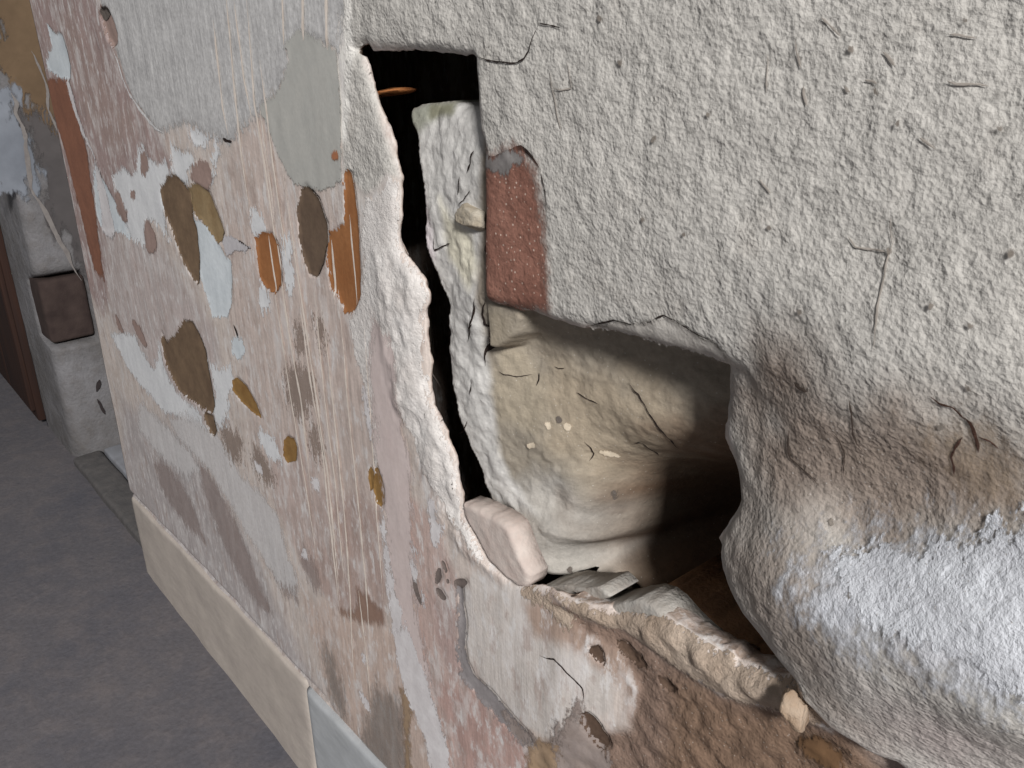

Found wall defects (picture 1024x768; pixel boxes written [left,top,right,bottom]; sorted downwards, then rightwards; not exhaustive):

peeling [46,24,71,81]
crack [478,23,560,64]
flaking render [98,0,345,285]
flaking render [248,169,361,314]
crack [590,315,718,348]
crack [848,219,895,348]
flaking render [161,311,330,489]
flaking render [368,467,385,507]
spalling [411,100,829,730]
crack [931,397,998,474]
water stain [772,501,1024,724]
spalling [580,712,611,752]